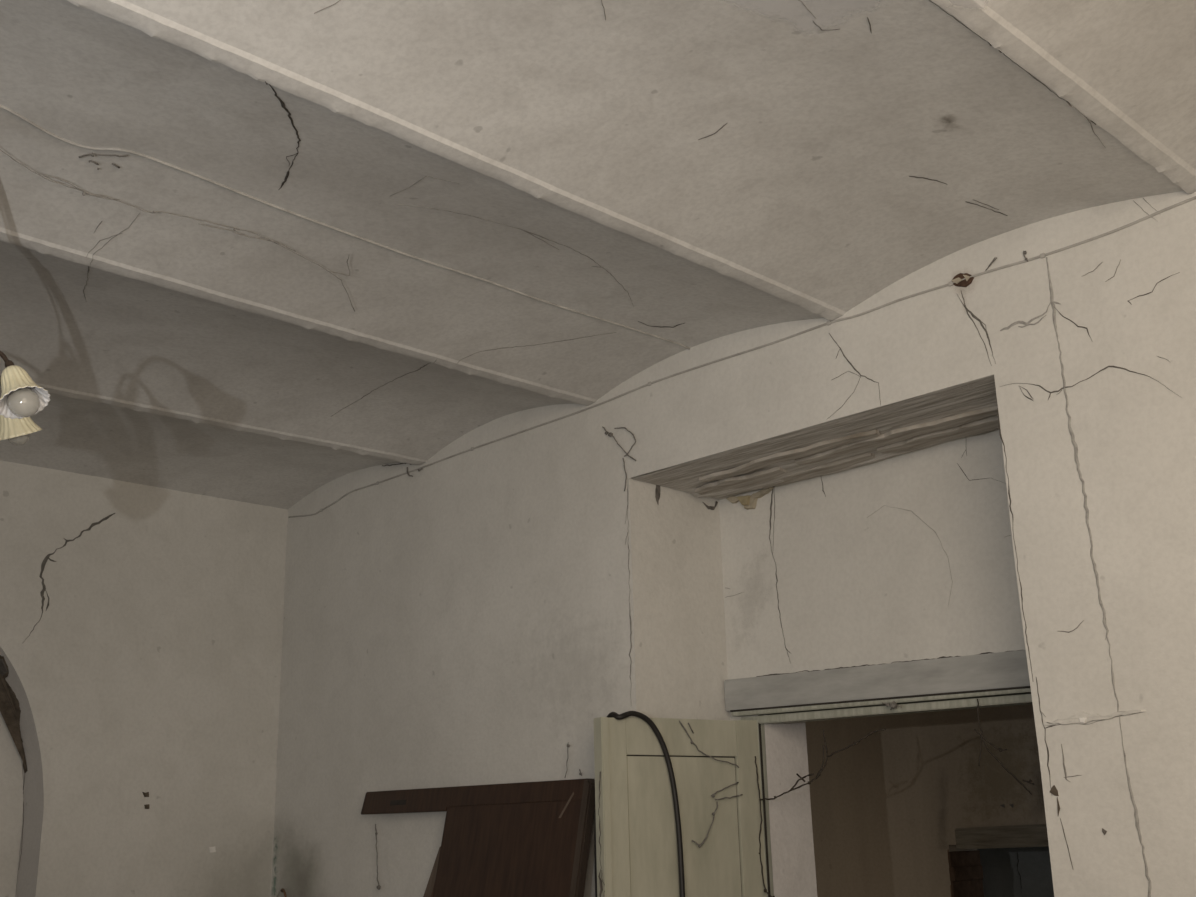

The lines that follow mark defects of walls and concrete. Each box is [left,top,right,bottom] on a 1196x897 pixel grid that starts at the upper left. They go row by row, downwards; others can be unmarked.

crack [83,213,140,299]
crack [265,82,301,189]
crack [332,176,684,416]
crack [909,176,1008,216]
crack [929,0,1105,147]
crack [25,513,115,640]
crack [624,488,632,696]
crack [756,257,1180,897]
flaking render [0,655,28,773]